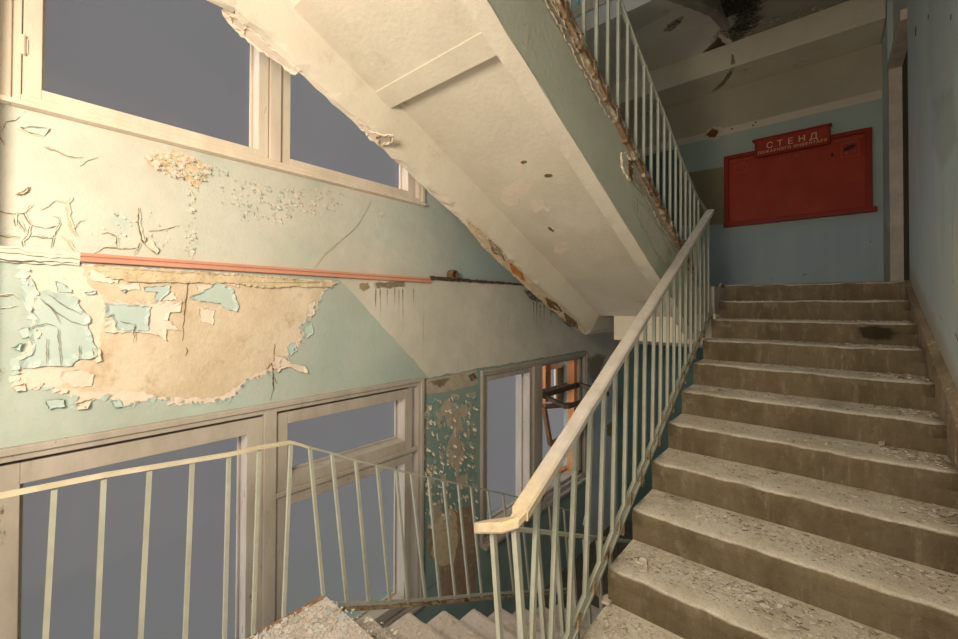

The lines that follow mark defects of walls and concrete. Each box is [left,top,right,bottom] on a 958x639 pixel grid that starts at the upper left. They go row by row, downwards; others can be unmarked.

spalling [544,0,610,117]
mould [714,0,764,41]
crack [44,147,99,167]
spalling [357,119,394,147]
flaking render [620,151,634,182]
peeling [9,182,340,410]
spalling [466,219,585,334]
peeling [424,370,478,604]